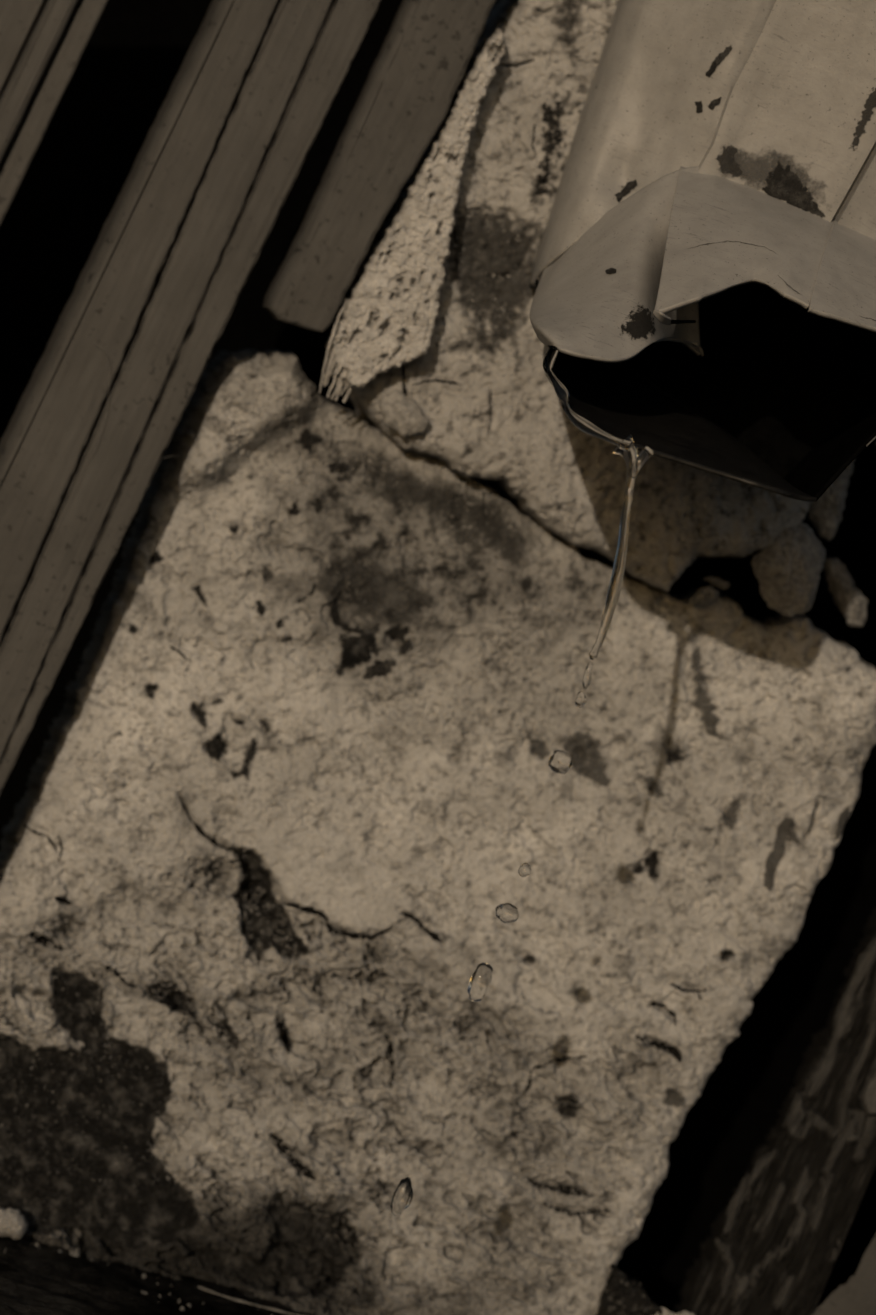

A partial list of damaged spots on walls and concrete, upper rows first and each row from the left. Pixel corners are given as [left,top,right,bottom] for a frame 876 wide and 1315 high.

crack [179,795,231,851]
crack [283,902,443,943]